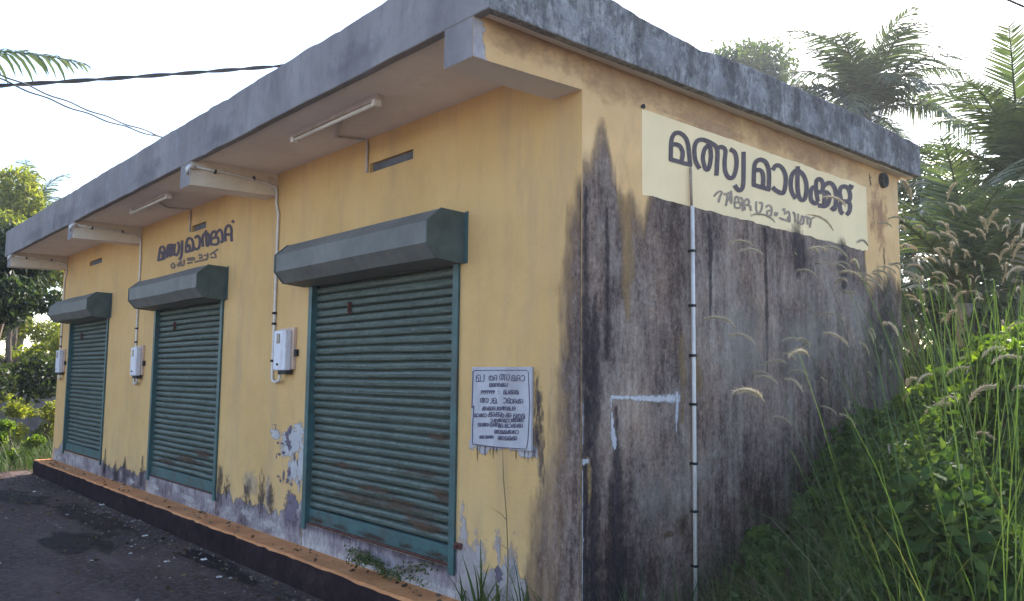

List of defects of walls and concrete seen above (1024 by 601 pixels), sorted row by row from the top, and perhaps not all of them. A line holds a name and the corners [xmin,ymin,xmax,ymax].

water stain [497,23,853,164]
water stain [527,128,904,601]
spalling [53,423,527,601]